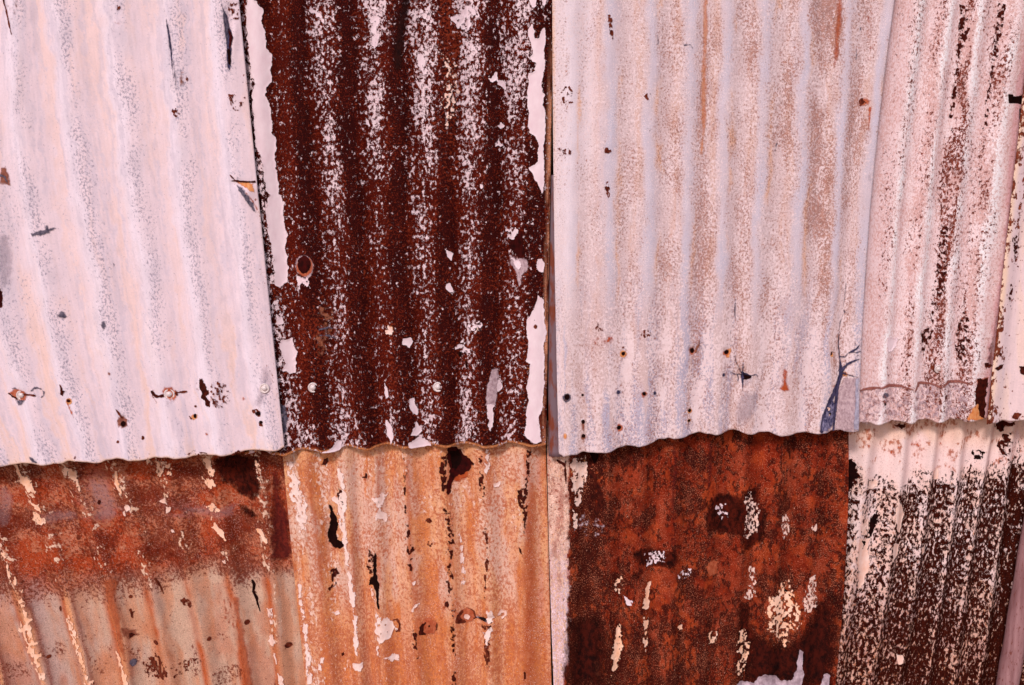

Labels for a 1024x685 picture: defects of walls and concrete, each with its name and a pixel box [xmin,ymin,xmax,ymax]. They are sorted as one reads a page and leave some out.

peeling [246,0,309,296]
peeling [527,24,546,193]
corrosion [949,4,970,131]
corrosion [505,227,528,286]
peeling [486,369,503,431]
peeling [524,296,547,444]
corrosion [967,344,1021,461]
corrosion [188,450,260,518]
corrosion [705,444,768,554]
peeling [736,629,804,685]
corrosion [737,595,838,685]
peeling [765,575,817,647]